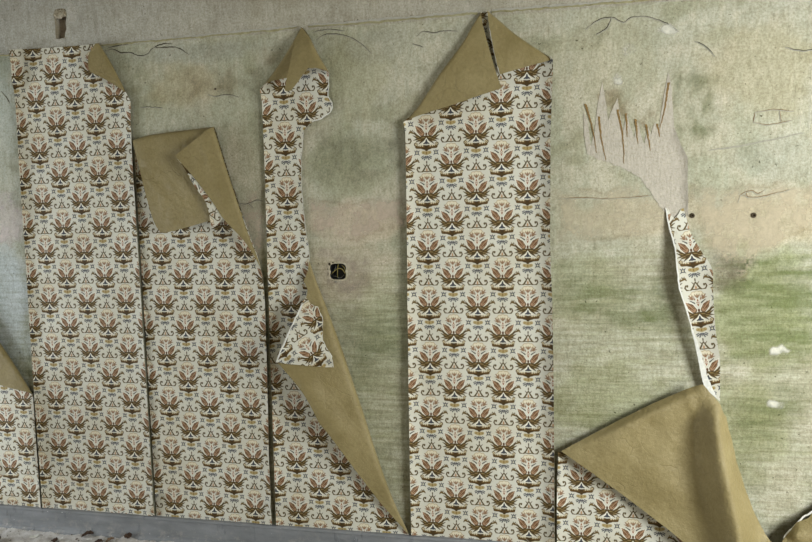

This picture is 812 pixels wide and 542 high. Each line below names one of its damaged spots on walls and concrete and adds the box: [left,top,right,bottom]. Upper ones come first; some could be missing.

peeling [277,262,409,534]